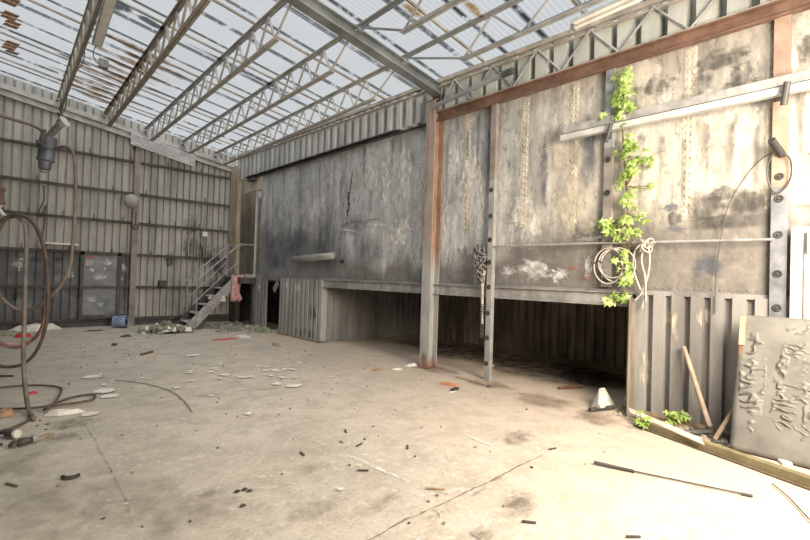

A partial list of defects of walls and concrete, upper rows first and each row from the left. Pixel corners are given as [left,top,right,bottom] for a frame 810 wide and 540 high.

damp [698,53,741,87]
damp [646,80,671,104]
efflorescence [365,147,425,267]
peeling [505,260,564,282]
crack [368,454,544,540]